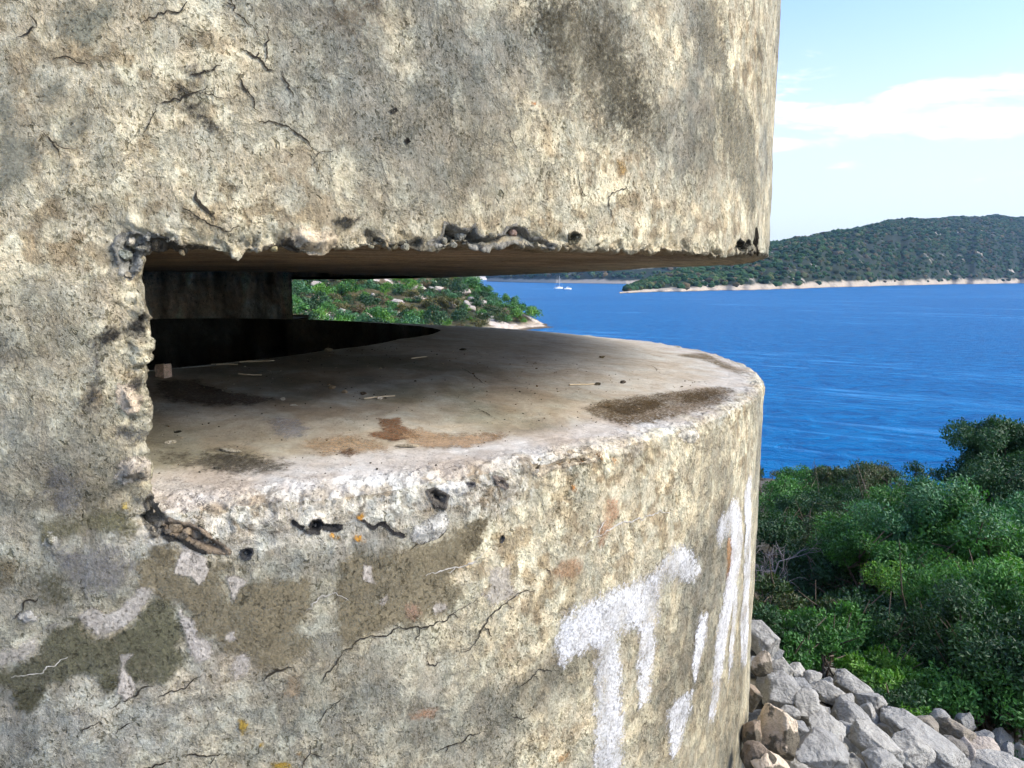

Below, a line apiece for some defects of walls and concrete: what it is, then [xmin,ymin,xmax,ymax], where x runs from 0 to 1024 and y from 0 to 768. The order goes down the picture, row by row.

crack [17,15,37,37]
crack [141,0,332,174]
crack [183,189,239,232]
spalling [109,230,208,281]
spalling [365,221,583,253]
leakage [600,399,662,414]
leakage [678,390,722,402]
spalling [426,487,450,510]
spalling [141,491,254,584]
spalling [289,519,343,535]
leakage [0,546,312,713]
crack [302,568,551,768]